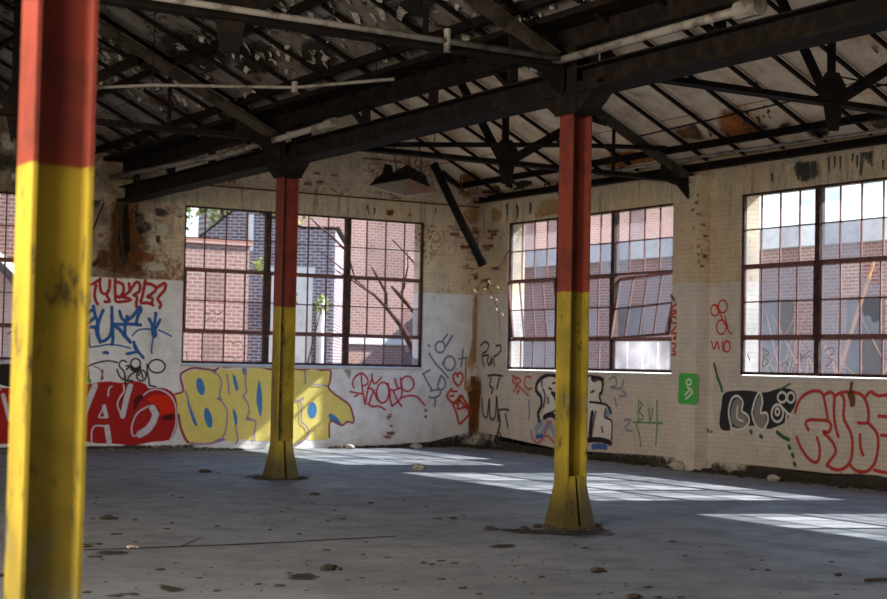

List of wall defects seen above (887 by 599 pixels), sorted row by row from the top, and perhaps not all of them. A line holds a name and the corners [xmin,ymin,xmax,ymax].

peeling [308,0,386,26]
peeling [97,33,222,118]
corrosion [717,111,759,136]
corrosion [96,198,153,277]
peeling [142,212,170,271]